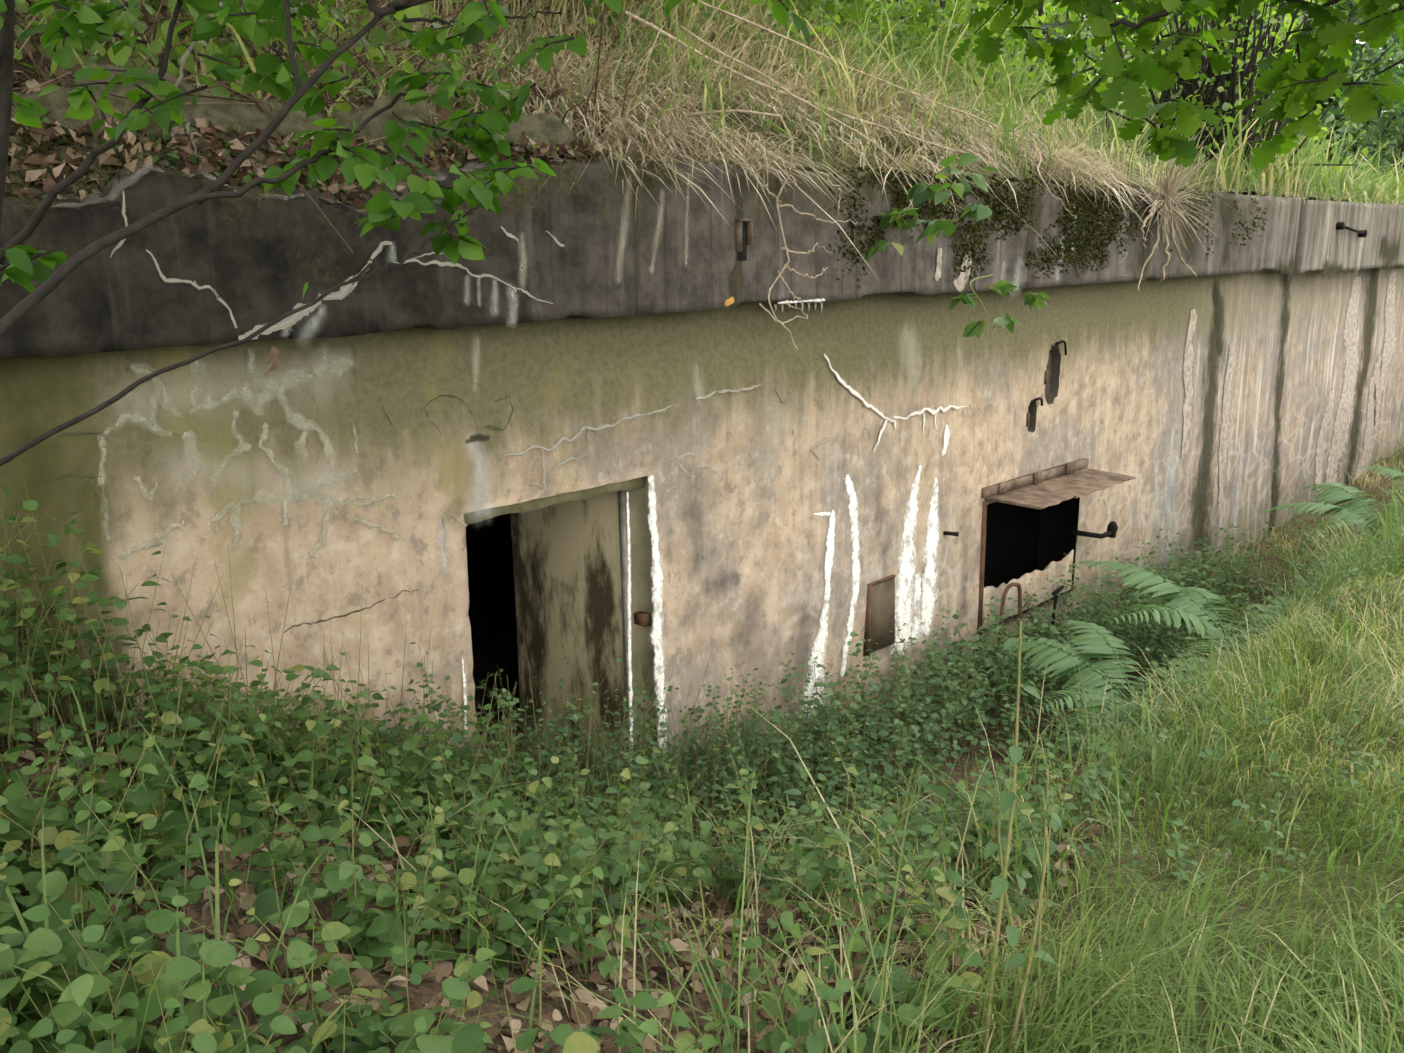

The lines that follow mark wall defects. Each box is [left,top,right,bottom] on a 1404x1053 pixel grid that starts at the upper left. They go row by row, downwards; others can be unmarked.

crack [110,191,553,340]
crack [501,226,564,247]
crack [354,350,841,496]
crack [824,354,967,452]
crack [284,590,414,633]
efflorescence [801,474,860,719]
efflorescence [895,465,939,652]